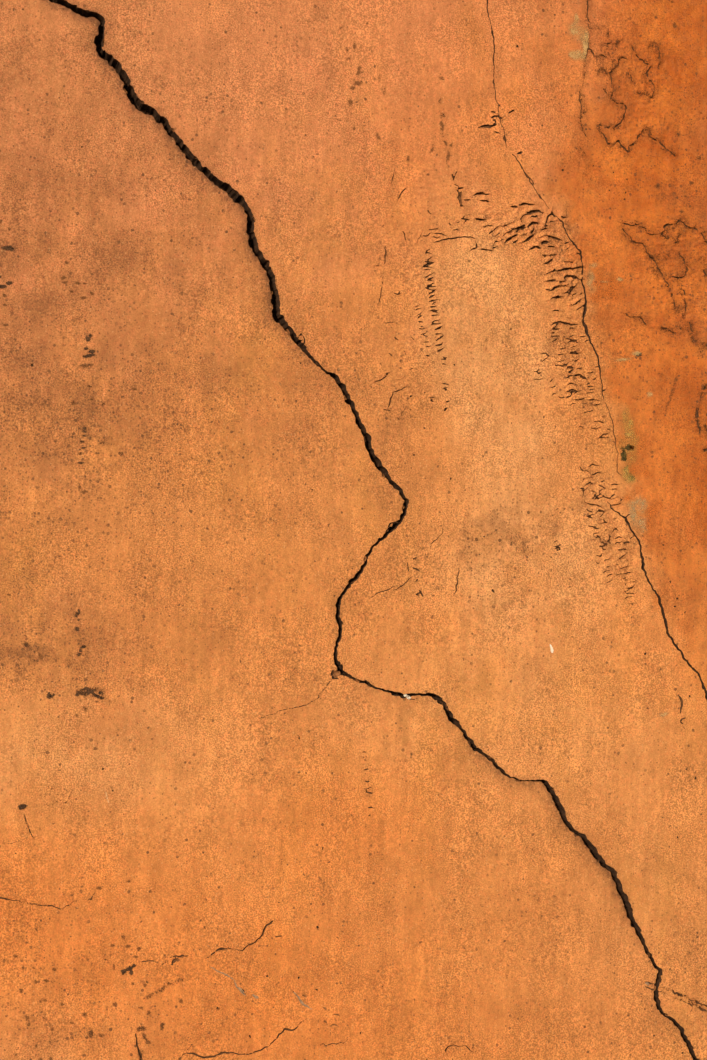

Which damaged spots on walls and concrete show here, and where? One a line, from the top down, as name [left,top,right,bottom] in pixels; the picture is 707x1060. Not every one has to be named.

crack [486,0,622,476]
crack [49,0,409,718]
crack [372,528,443,597]
crack [609,503,707,700]
crack [0,894,94,910]
crack [354,679,700,1060]
crack [207,921,282,999]
crack [135,1031,144,1060]
crack [179,991,348,1060]